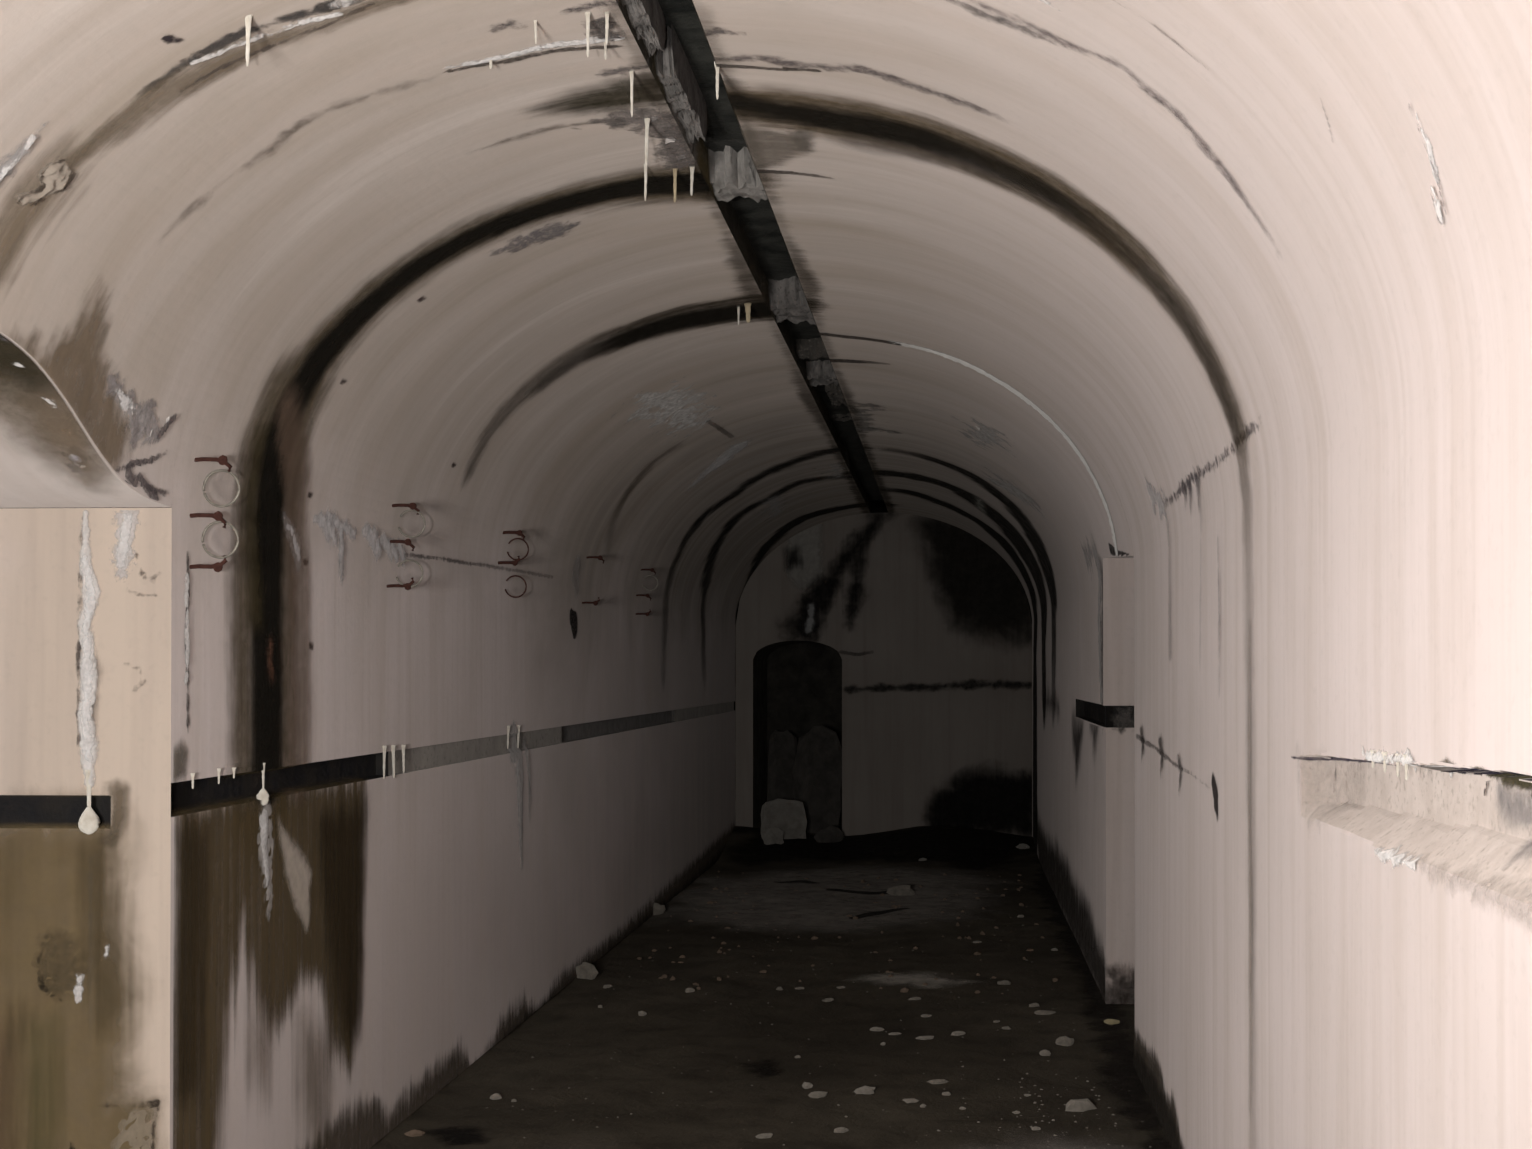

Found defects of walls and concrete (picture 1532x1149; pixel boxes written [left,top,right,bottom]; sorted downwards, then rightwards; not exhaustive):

spalling [333,0,365,9]
crack [714,56,982,111]
crack [952,0,1243,199]
peeling [107,374,170,448]
damp [232,159,714,775]
damp [584,289,774,358]
crack [1166,424,1255,502]
damp [76,510,100,787]
damp [0,785,146,1149]
damp [173,780,364,1149]
damp [490,816,1182,1149]
spalling [115,1100,160,1149]